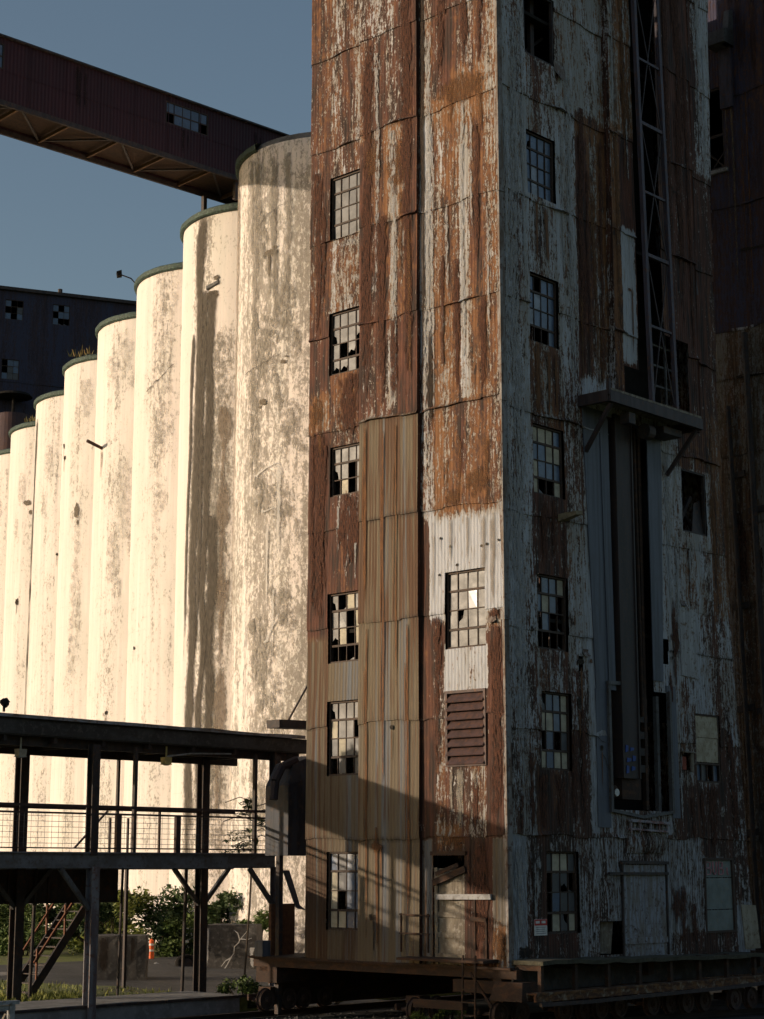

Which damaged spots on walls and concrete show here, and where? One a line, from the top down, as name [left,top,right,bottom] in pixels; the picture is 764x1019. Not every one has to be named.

damp [249,152,292,425]
rust [309,0,413,621]
peeling [374,52,397,367]
peeling [423,34,435,491]
rust [440,255,460,384]
peeling [445,100,472,356]
rust [434,0,487,259]
damp [23,423,37,600]
damp [183,217,218,728]
damp [183,764,197,853]
rust [467,842,507,962]
rust [471,626,505,827]